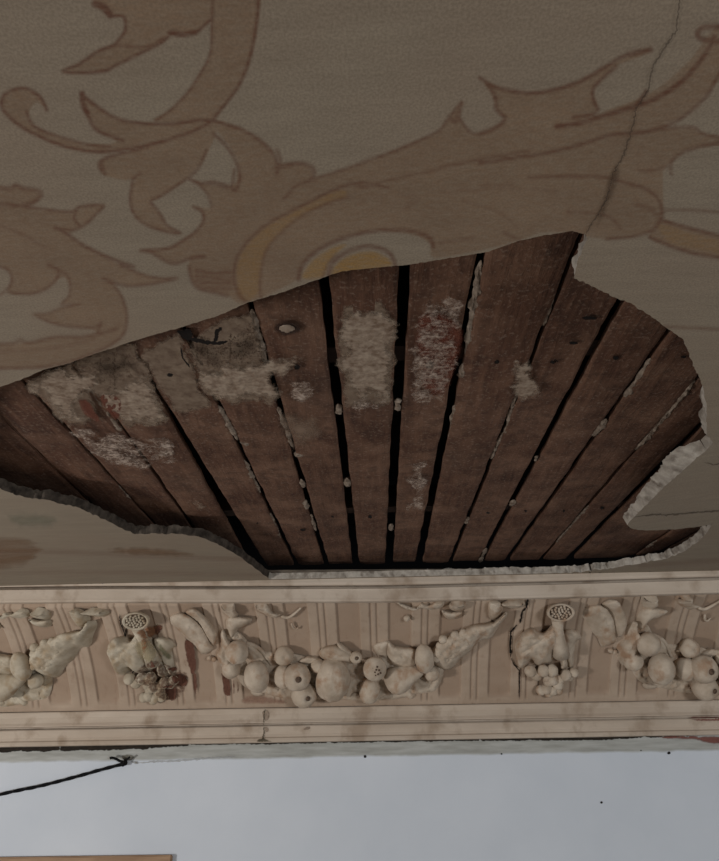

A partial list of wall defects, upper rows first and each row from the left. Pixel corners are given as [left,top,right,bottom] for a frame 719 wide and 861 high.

spalling [572,234,587,278]
spalling [623,386,713,525]
spalling [0,478,712,579]
crack [509,599,529,696]